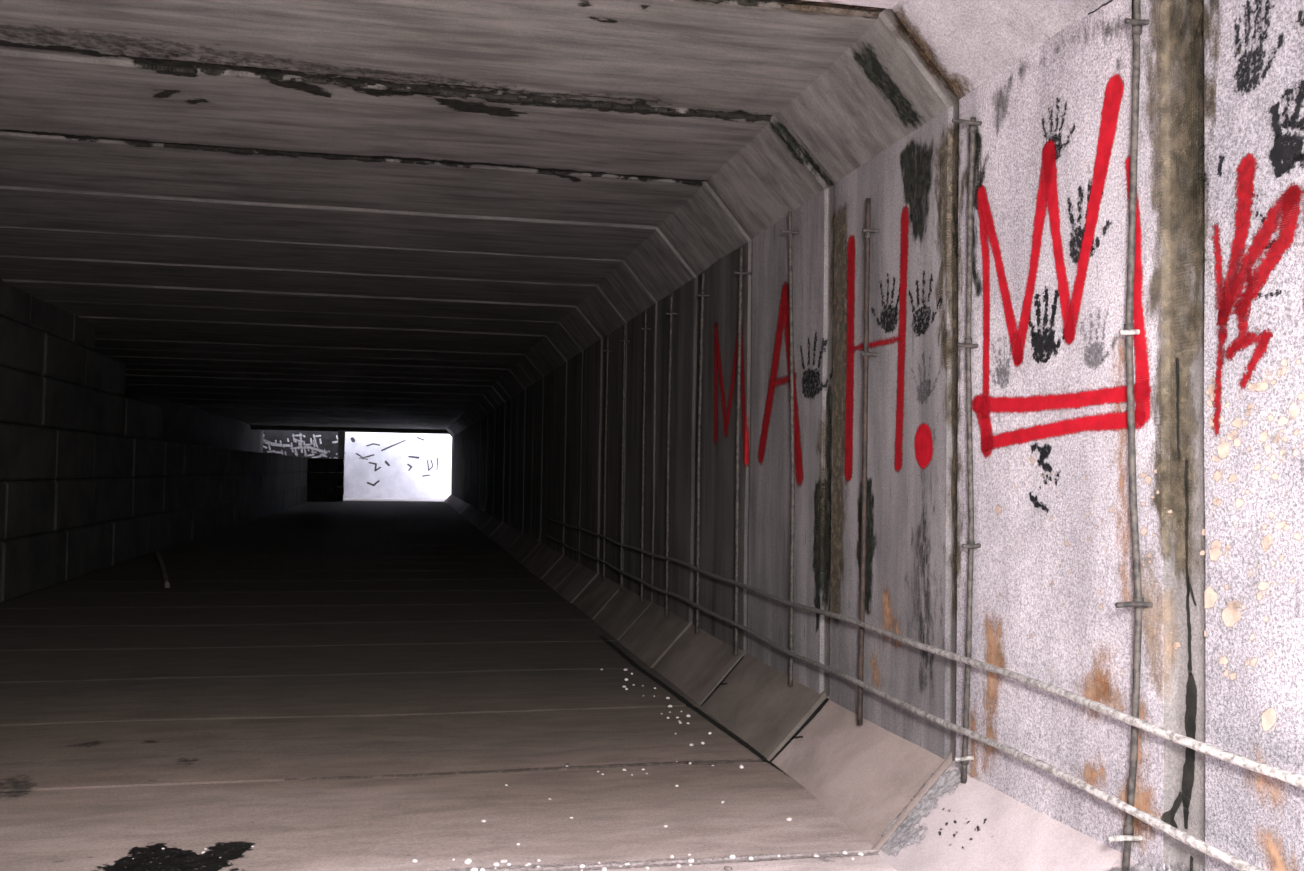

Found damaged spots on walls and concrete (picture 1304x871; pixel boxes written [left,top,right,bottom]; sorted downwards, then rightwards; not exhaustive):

damp [0,25,661,102]
damp [769,122,834,187]
damp [780,0,970,99]
damp [996,68,1022,133]
damp [812,206,877,632]
damp [853,44,986,618]
damp [1146,0,1219,579]
damp [917,510,932,691]